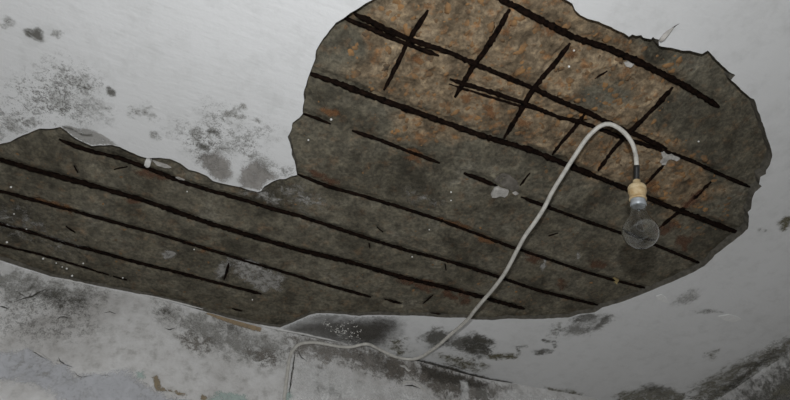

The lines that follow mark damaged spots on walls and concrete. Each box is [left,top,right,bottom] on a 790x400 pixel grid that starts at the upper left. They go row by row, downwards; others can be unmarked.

spalling [310,0,772,320]
spalling [0,75,565,332]
damp [0,271,91,307]
damp [217,260,284,292]
damp [160,309,284,363]
damp [292,318,580,400]
damp [568,314,609,334]
damp [614,339,790,400]